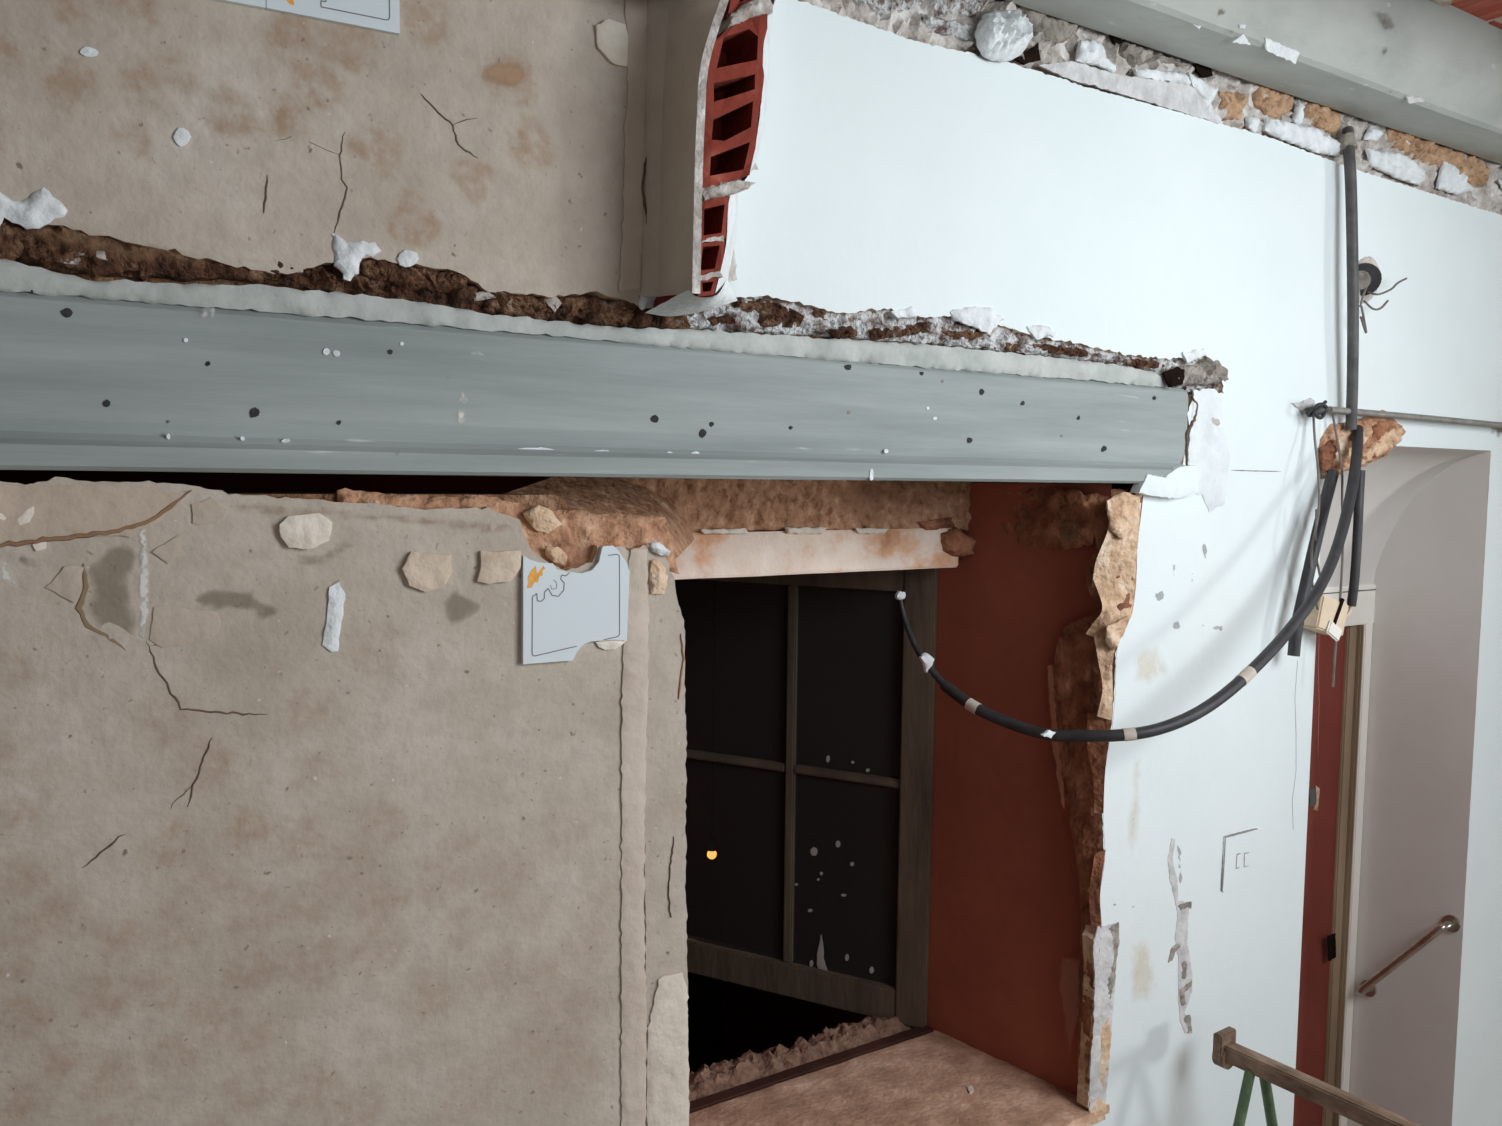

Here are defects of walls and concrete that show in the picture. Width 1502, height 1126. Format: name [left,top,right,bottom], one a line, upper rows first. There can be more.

spalling [1014,42,1041,65]
spalling [1075,35,1223,124]
crack [421,94,478,158]
spalling [1245,100,1341,157]
spalling [1363,127,1474,195]
spalling [0,220,1229,400]
crack [147,643,267,807]
spalling [336,477,1143,1126]
peeling [1168,943,1192,1033]